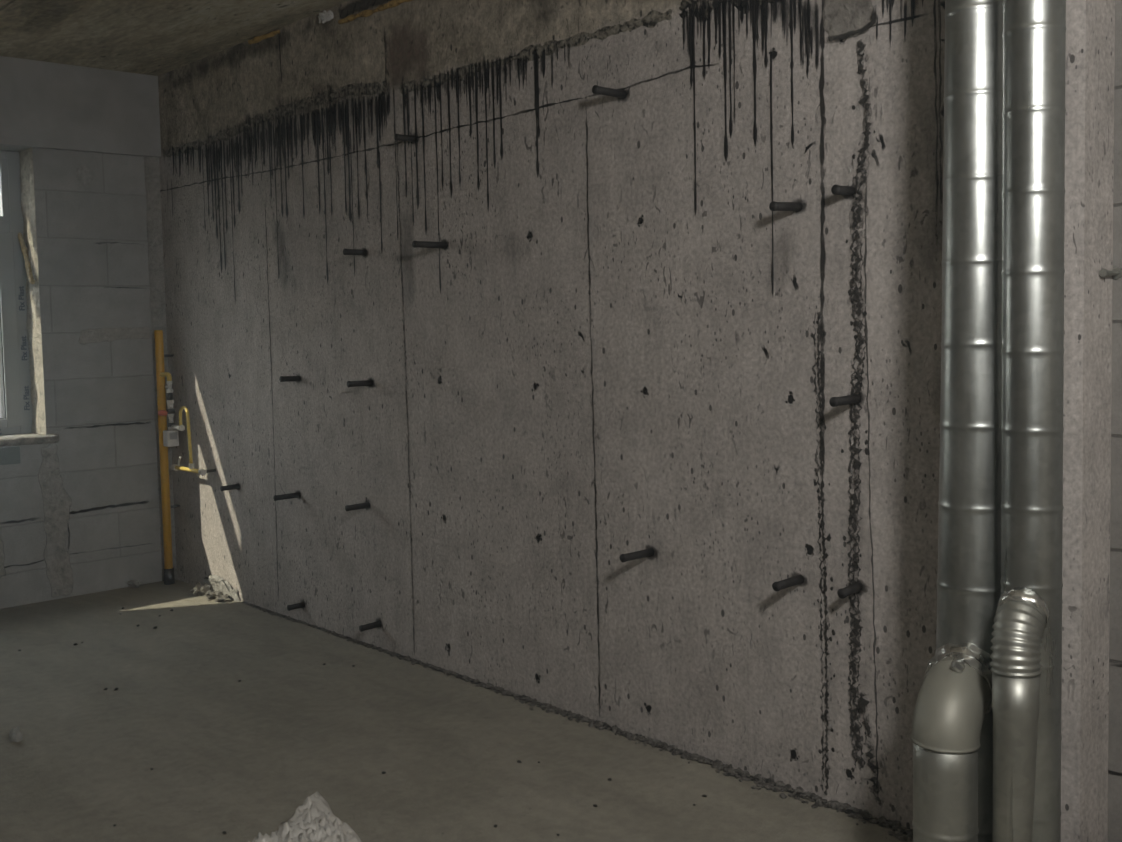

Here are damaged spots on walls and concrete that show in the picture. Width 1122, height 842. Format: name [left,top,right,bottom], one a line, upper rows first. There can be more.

water stain [167,44,570,301]
water stain [683,0,822,295]
water stain [876,0,923,45]